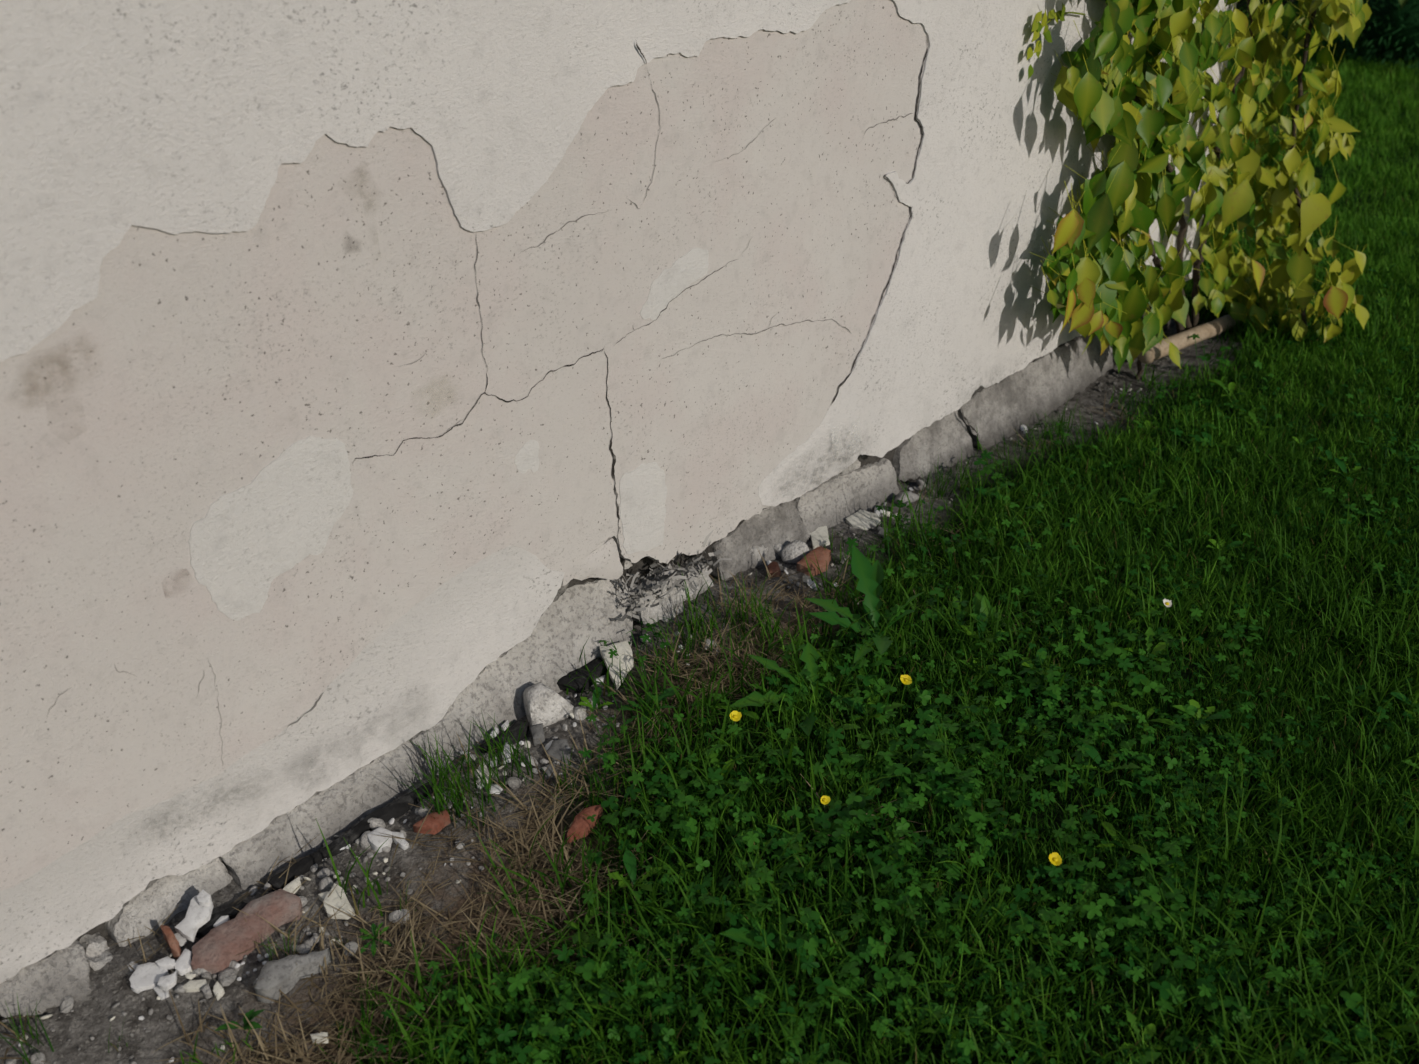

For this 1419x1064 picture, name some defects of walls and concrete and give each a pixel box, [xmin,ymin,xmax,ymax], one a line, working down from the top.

crack [522,41,661,252]
crack [662,43,928,405]
peeling [0,0,928,894]
crack [352,239,751,555]
peeling [127,890,229,1001]
peeling [318,883,355,920]